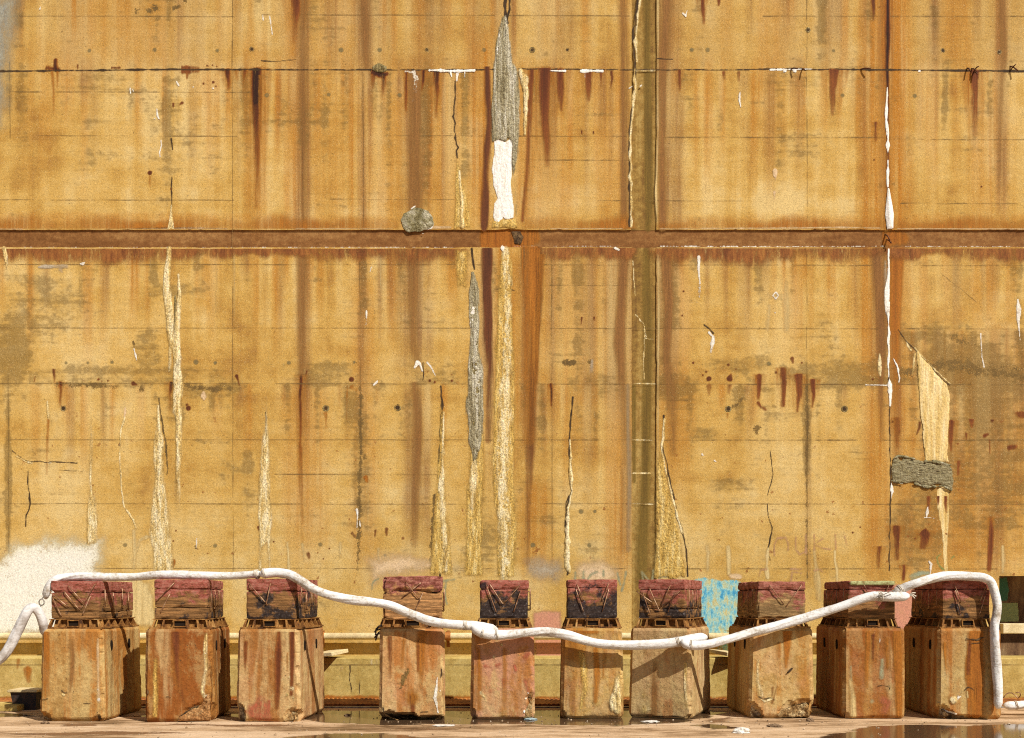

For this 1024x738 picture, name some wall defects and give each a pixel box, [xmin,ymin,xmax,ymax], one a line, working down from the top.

corrosion [422,70,440,109]
corrosion [480,66,636,482]
crack [632,261,648,379]
corrosion [755,374,766,410]
corrosion [775,357,818,410]
crack [564,396,574,575]